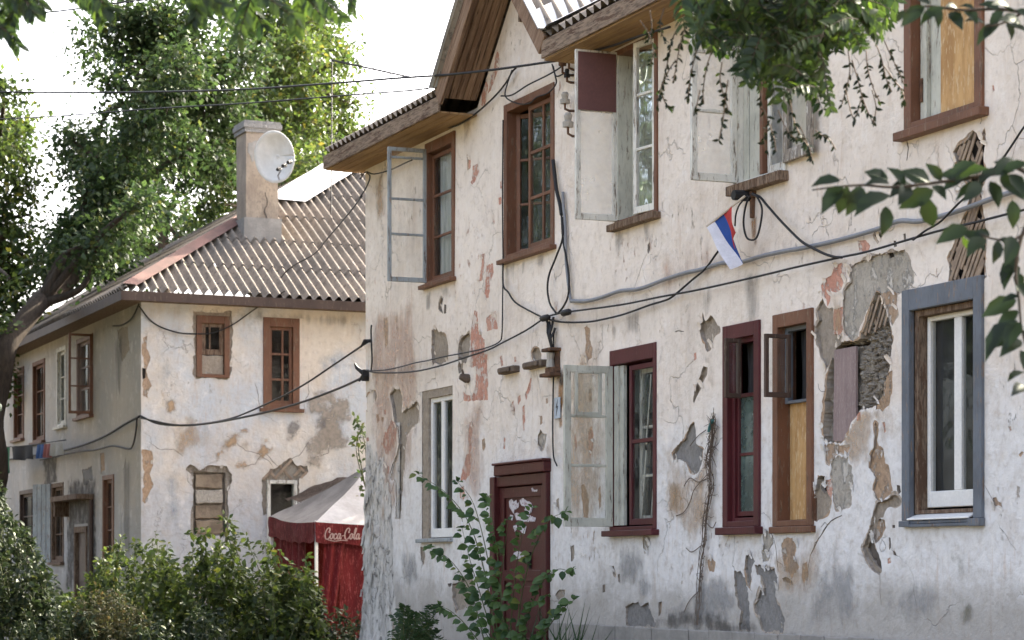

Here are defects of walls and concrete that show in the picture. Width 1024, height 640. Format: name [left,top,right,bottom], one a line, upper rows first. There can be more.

peeling [118,326,152,398]
peeling [261,393,350,516]
peeling [366,387,420,519]
peeling [431,310,517,402]
peeling [510,378,532,430]
peeling [671,422,704,475]
peeling [693,312,721,403]
spalling [811,231,915,575]
peeling [625,602,662,628]
peeling [734,527,809,635]